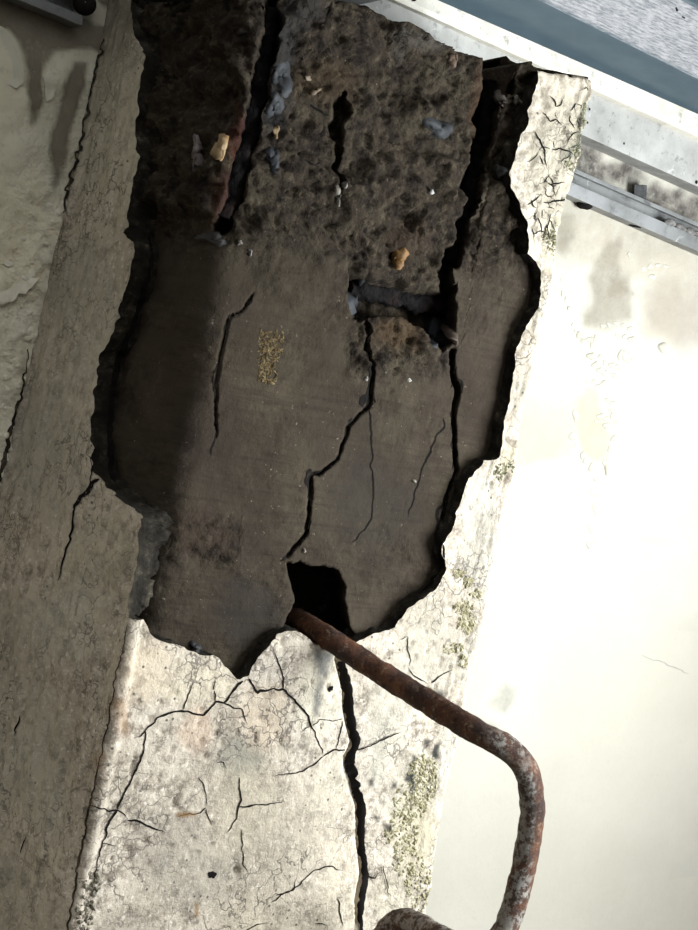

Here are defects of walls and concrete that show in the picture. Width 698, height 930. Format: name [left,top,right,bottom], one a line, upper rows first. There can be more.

leakage [0,0,104,120]
leakage [50,63,86,179]
crack [320,2,333,27]
crack [528,87,588,237]
crack [0,349,29,482]
crack [210,294,253,458]
crack [281,320,376,561]
spalling [90,0,572,679]
crack [409,351,464,593]
crack [401,636,452,683]
crack [66,627,400,930]